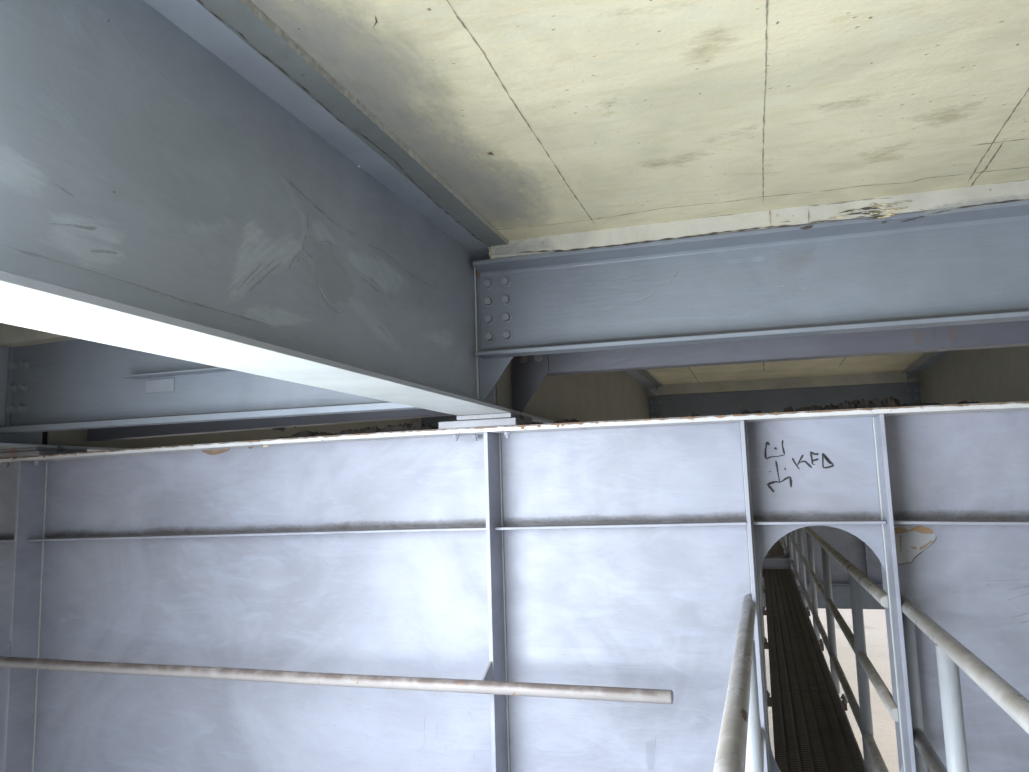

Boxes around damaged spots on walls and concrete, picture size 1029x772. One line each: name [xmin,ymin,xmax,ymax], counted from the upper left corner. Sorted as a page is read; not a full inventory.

crack [197,0,886,256]
crack [928,179,1028,215]
peeling [894,525,936,565]